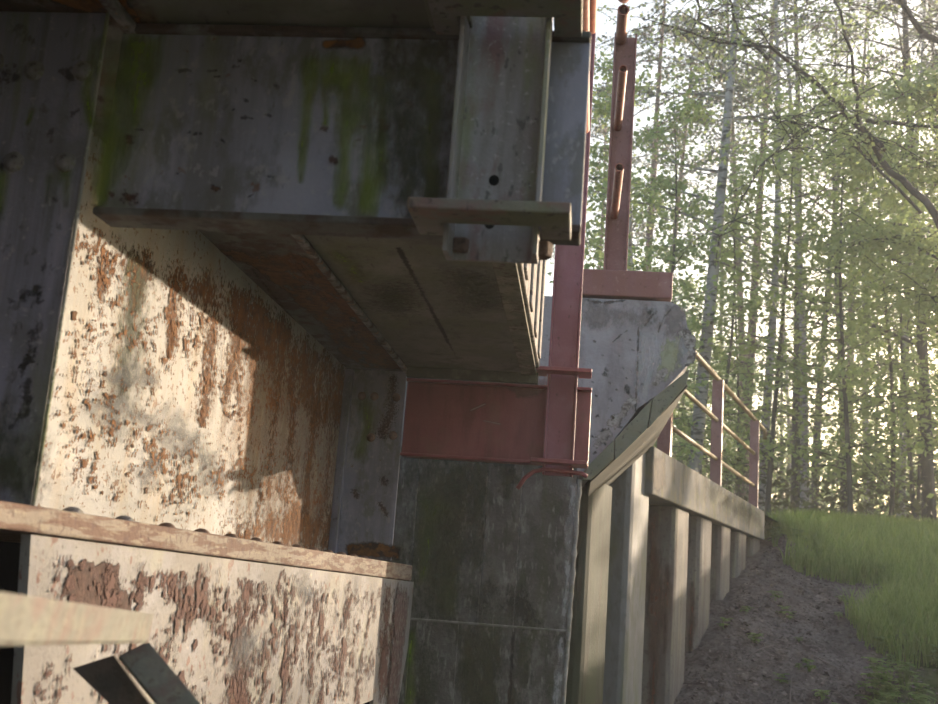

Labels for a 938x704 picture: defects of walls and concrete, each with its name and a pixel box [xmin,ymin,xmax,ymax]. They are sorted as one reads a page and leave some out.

water stain [336,37,453,218]
corrosion [74,228,345,551]
peeling [34,645,72,704]
peeling [50,545,408,704]
corrosion [346,541,400,560]